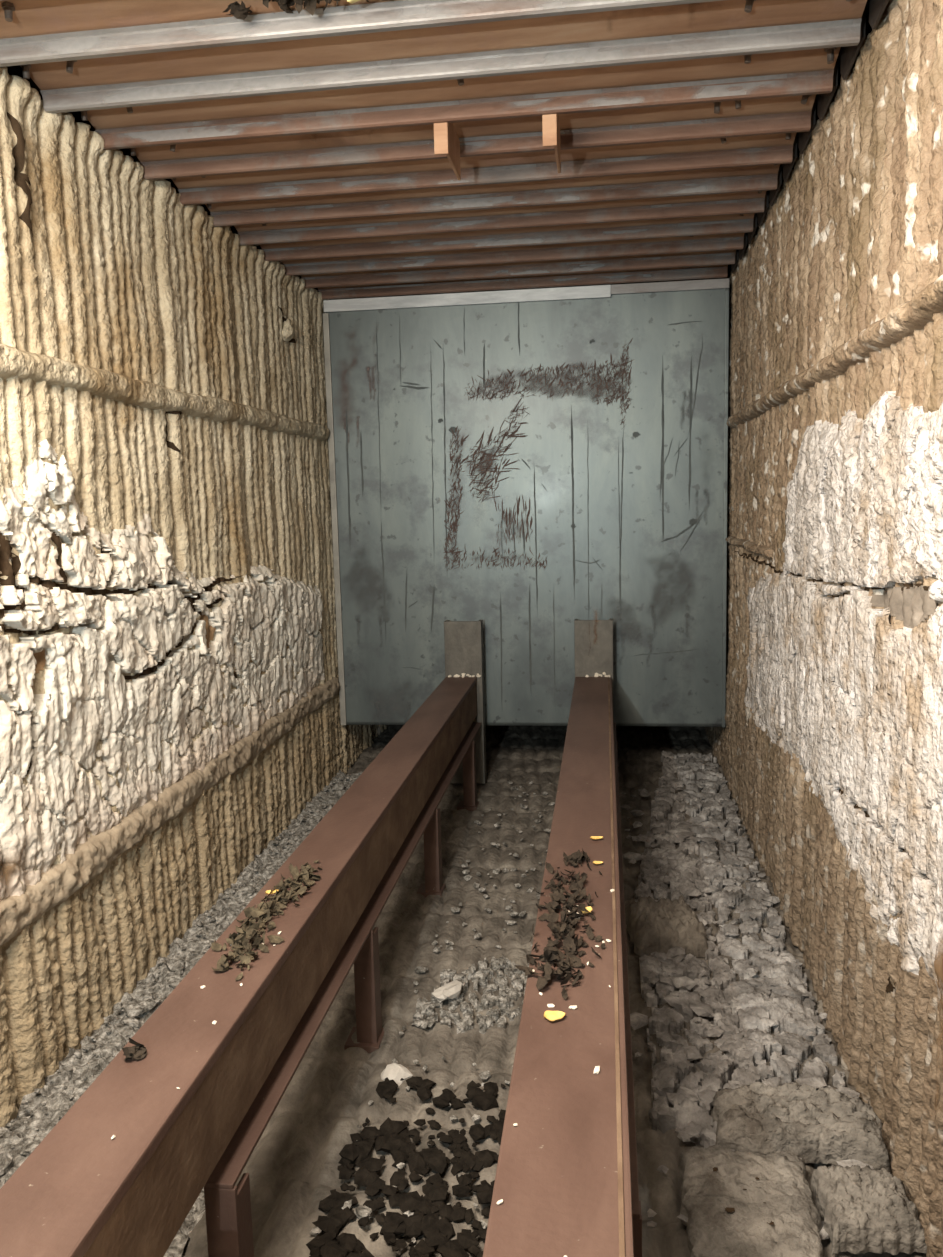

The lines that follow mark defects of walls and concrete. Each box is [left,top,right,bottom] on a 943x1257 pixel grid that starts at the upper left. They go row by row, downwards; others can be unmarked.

crack [0,530,241,680]
crack [734,551,929,598]
leakage [0,853,22,899]
leakage [934,940,943,1065]